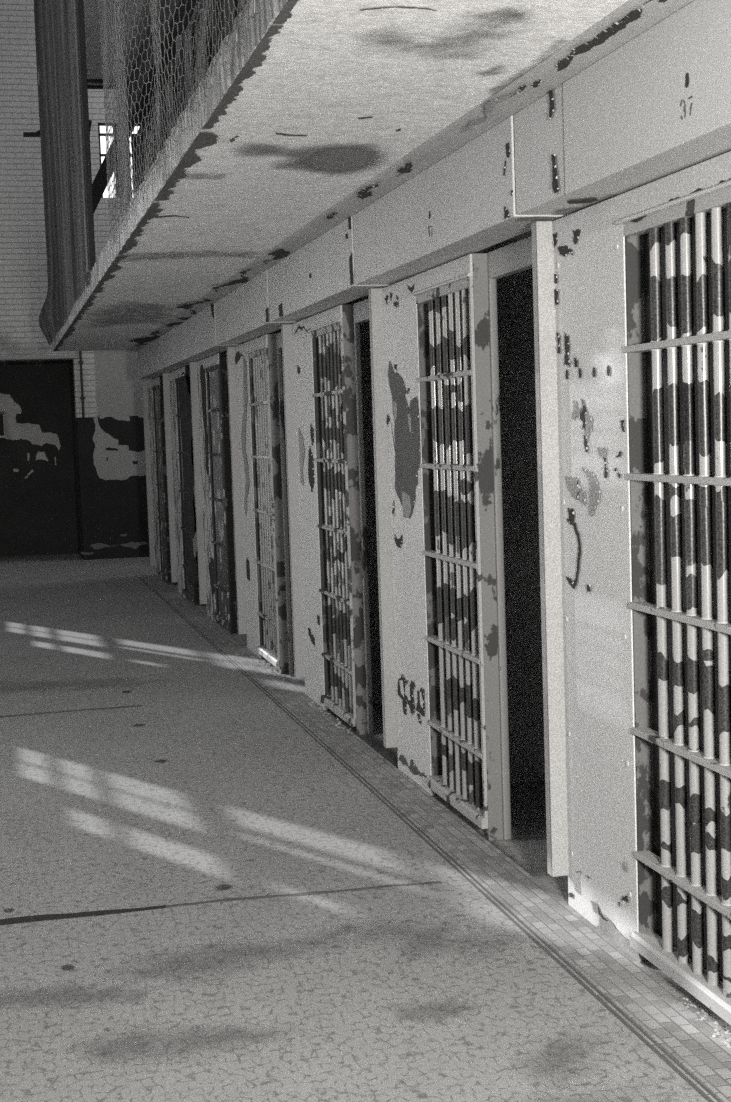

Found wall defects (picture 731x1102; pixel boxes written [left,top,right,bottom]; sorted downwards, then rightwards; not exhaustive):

leakage [243,146,376,174]
peeling [0,393,61,478]
peeling [93,411,146,480]
peeling [298,343,346,500]
peeling [387,330,473,518]
peeling [565,399,622,516]
peeling [652,380,731,473]
peeling [654,484,729,610]
peeling [308,604,351,647]
peeling [657,649,731,735]
peeling [659,777,731,854]
peeling [721,875,731,901]